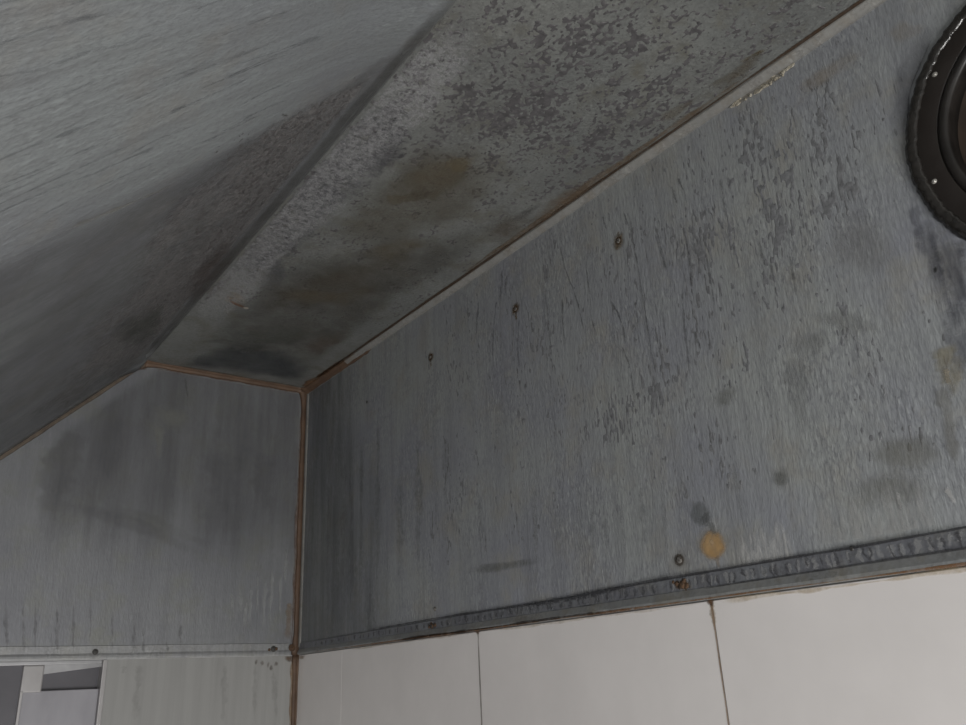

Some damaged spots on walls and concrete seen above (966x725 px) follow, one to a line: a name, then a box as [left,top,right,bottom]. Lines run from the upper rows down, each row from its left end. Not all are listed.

damp [189,47,463,306]